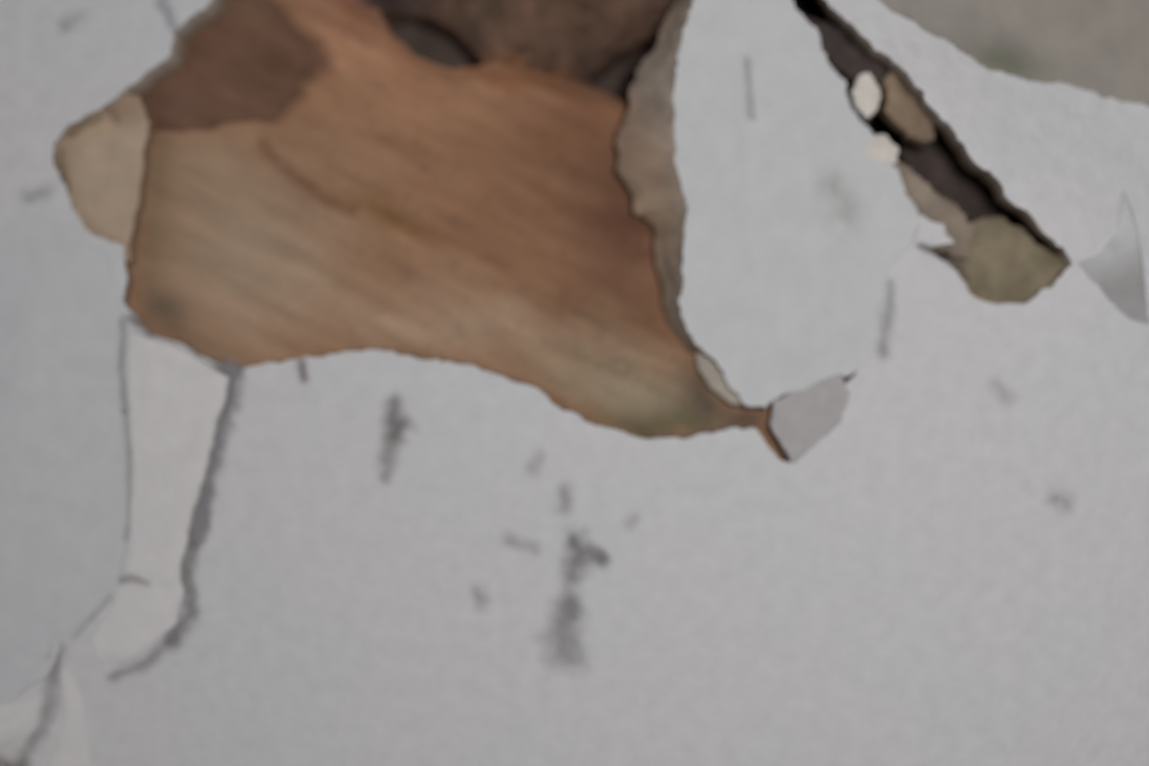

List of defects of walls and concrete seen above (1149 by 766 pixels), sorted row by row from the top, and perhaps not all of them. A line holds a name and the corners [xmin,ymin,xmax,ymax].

peeling [879,0,1149,106]
peeling [1077,191,1149,325]
spalling [55,0,920,663]
crack [114,360,242,676]
peeling [0,651,91,766]